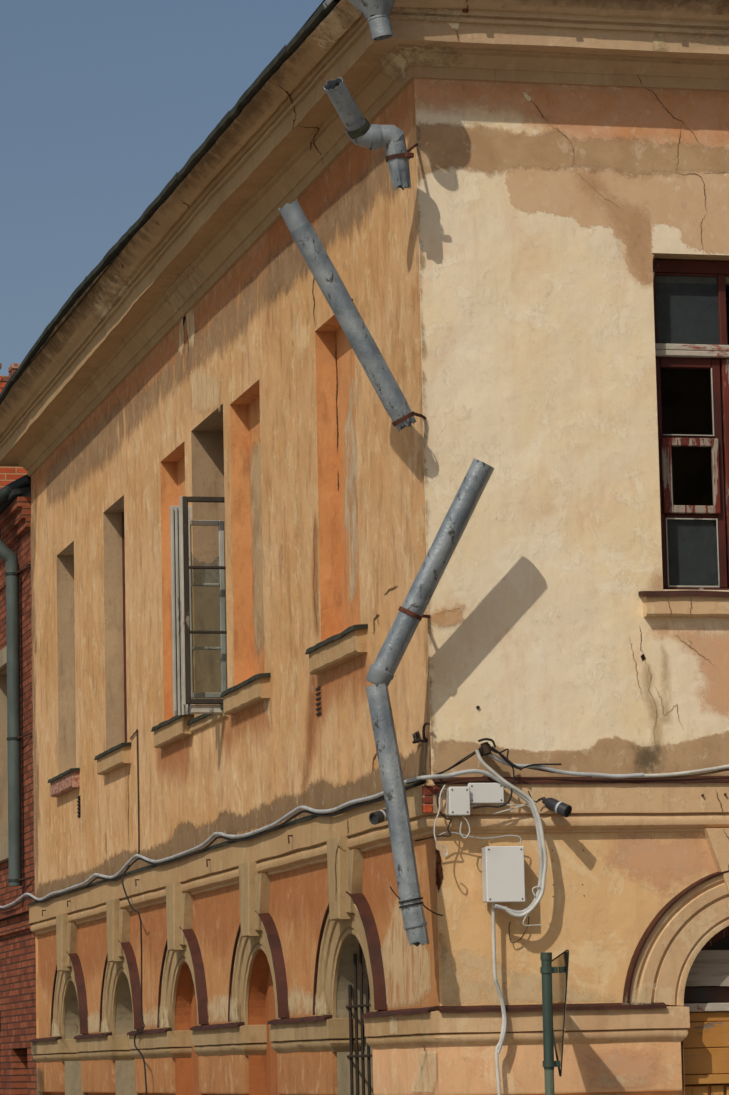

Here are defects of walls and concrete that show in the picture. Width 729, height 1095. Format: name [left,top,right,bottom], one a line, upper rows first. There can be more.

peeling [300,146,376,250]
peeling [372,48,729,285]
crack [531,101,618,207]
crack [637,75,729,249]
crack [629,625,683,746]
crack [667,597,713,665]
peeling [660,628,729,715]
peeling [399,707,729,814]
peeling [36,768,383,898]